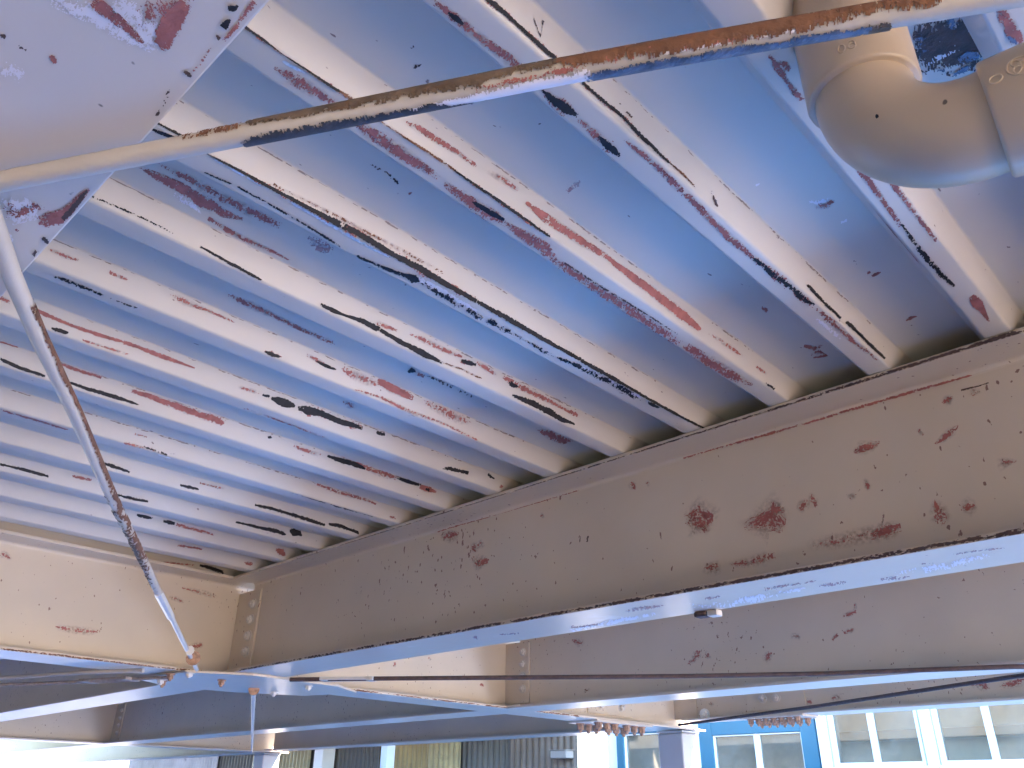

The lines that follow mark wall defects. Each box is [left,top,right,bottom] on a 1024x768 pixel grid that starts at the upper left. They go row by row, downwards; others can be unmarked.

peeling [90,0,194,51]
rust [178,0,942,139]
peeling [3,189,173,234]
rust [381,121,456,171]
peeling [228,0,886,386]
peeling [141,154,705,444]
rust [31,303,154,593]
peeling [62,364,226,426]
rust [311,328,1024,555]
rust [3,648,202,671]
rust [239,528,1024,671]